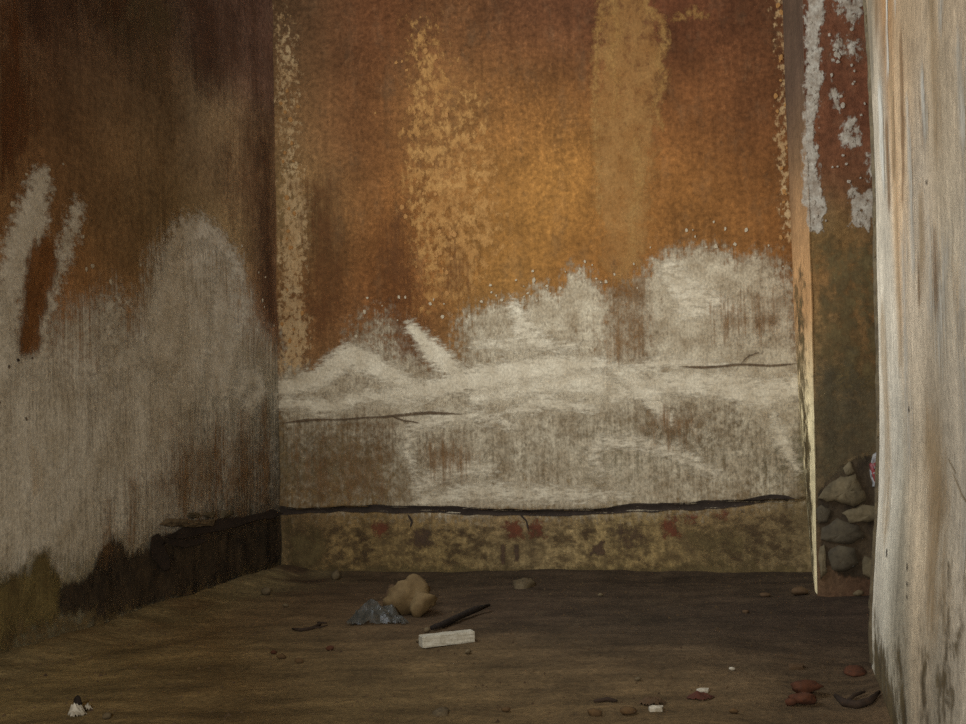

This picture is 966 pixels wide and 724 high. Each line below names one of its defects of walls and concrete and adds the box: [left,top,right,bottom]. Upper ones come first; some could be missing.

damp [20,239,58,355]
crack [150,494,795,571]
damp [568,237,888,575]
spalling [800,0,887,664]